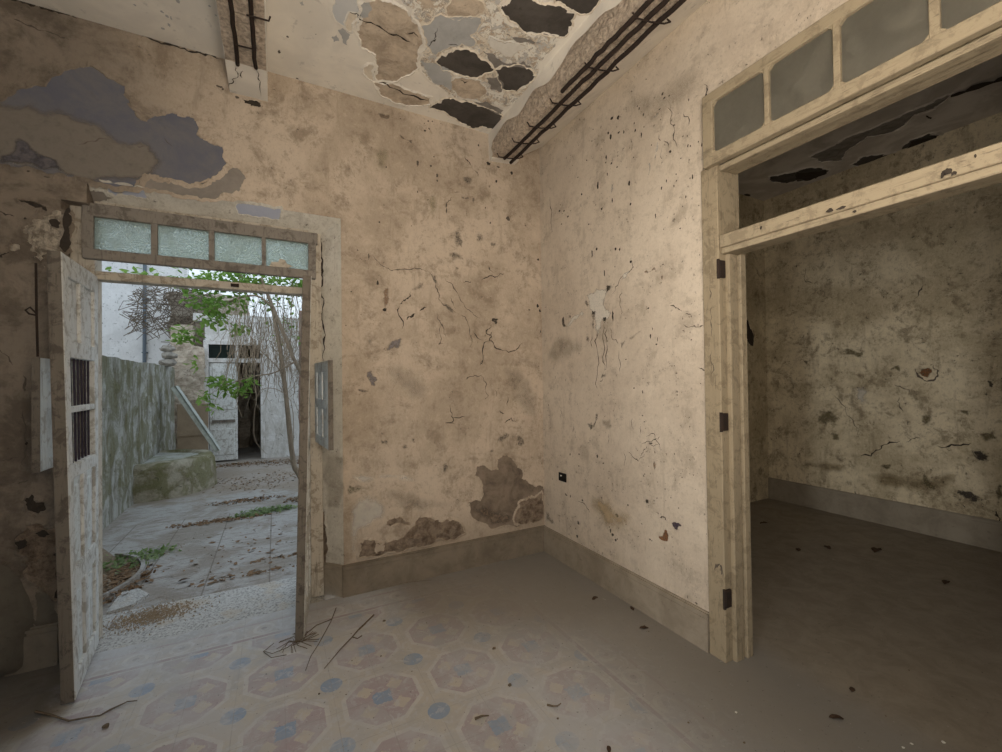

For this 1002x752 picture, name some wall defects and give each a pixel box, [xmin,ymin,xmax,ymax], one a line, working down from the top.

spalling [208,0,271,71]
peeling [328,0,687,175]
peeling [0,60,285,222]
spalling [4,196,75,270]
crack [369,256,521,423]
crack [591,293,622,382]
spalling [356,514,467,560]
spalling [512,490,545,526]